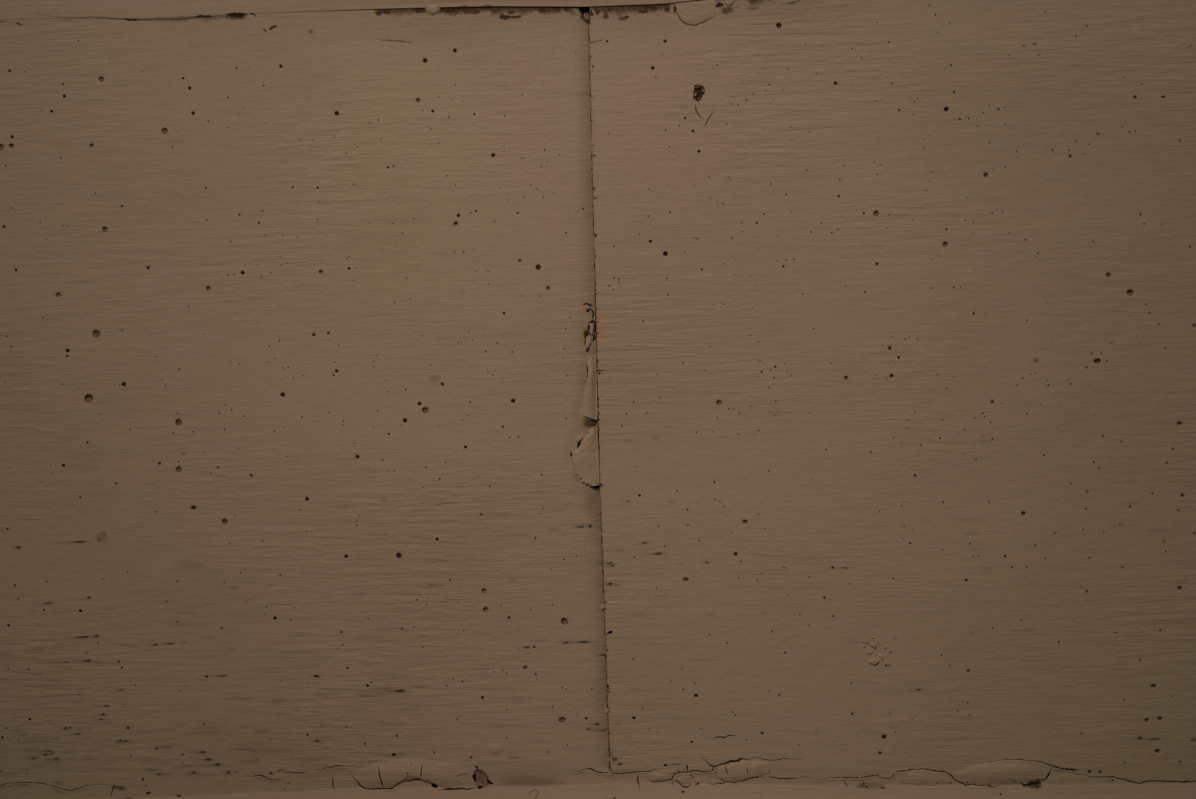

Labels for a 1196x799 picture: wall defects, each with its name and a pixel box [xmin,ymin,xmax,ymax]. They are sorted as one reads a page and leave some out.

peeling [583,303,596,352]
crack [567,31,1196,790]
crack [244,765,478,793]